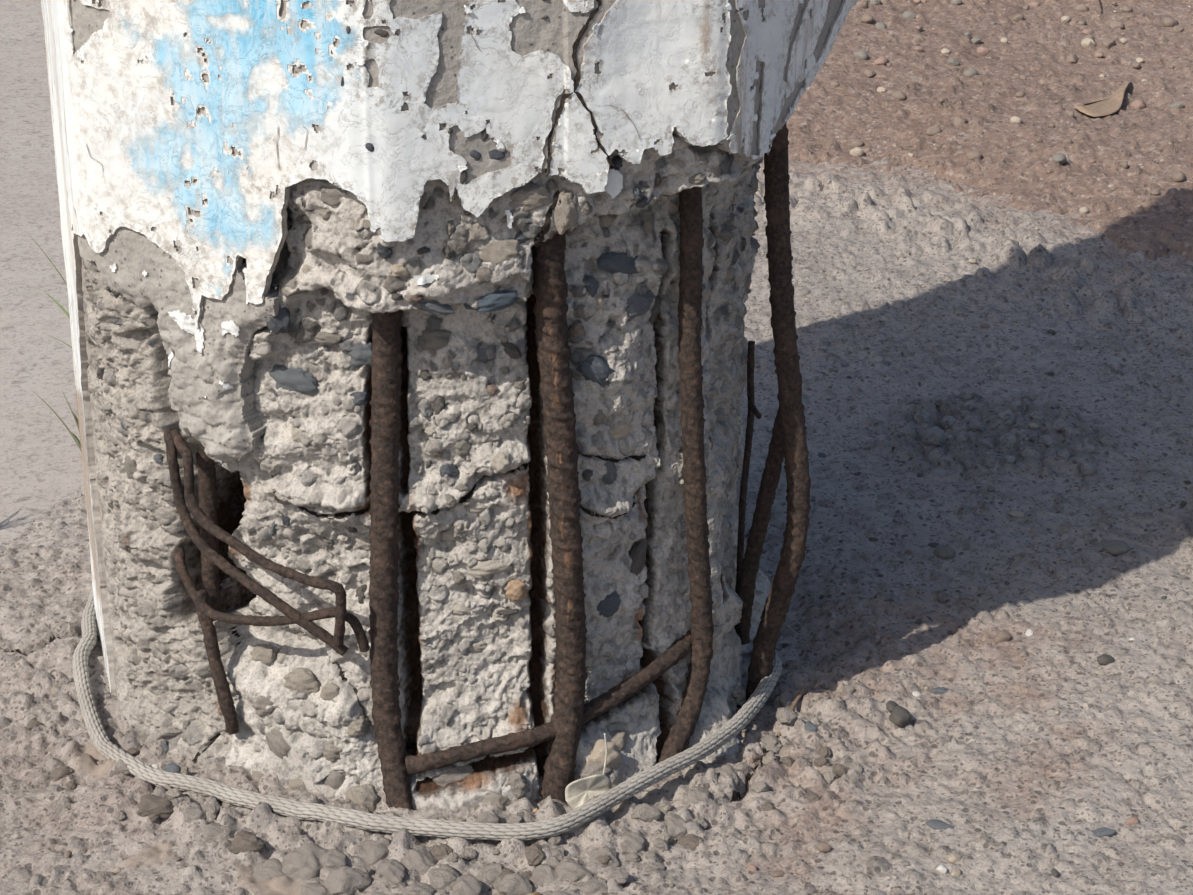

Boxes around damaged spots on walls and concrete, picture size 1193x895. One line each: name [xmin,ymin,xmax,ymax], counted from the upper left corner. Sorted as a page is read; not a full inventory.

peeling [69,0,110,52]
peeling [813,0,843,61]
crack [534,0,641,247]
corrosion [216,472,254,611]
corrosion [363,367,372,509]
corrosion [399,326,410,496]
corrosion [398,511,423,756]
spalling [77,0,811,813]
corrosion [416,741,550,798]
corrosion [526,294,550,727]
corrosion [581,675,676,762]
corrosion [638,483,657,669]